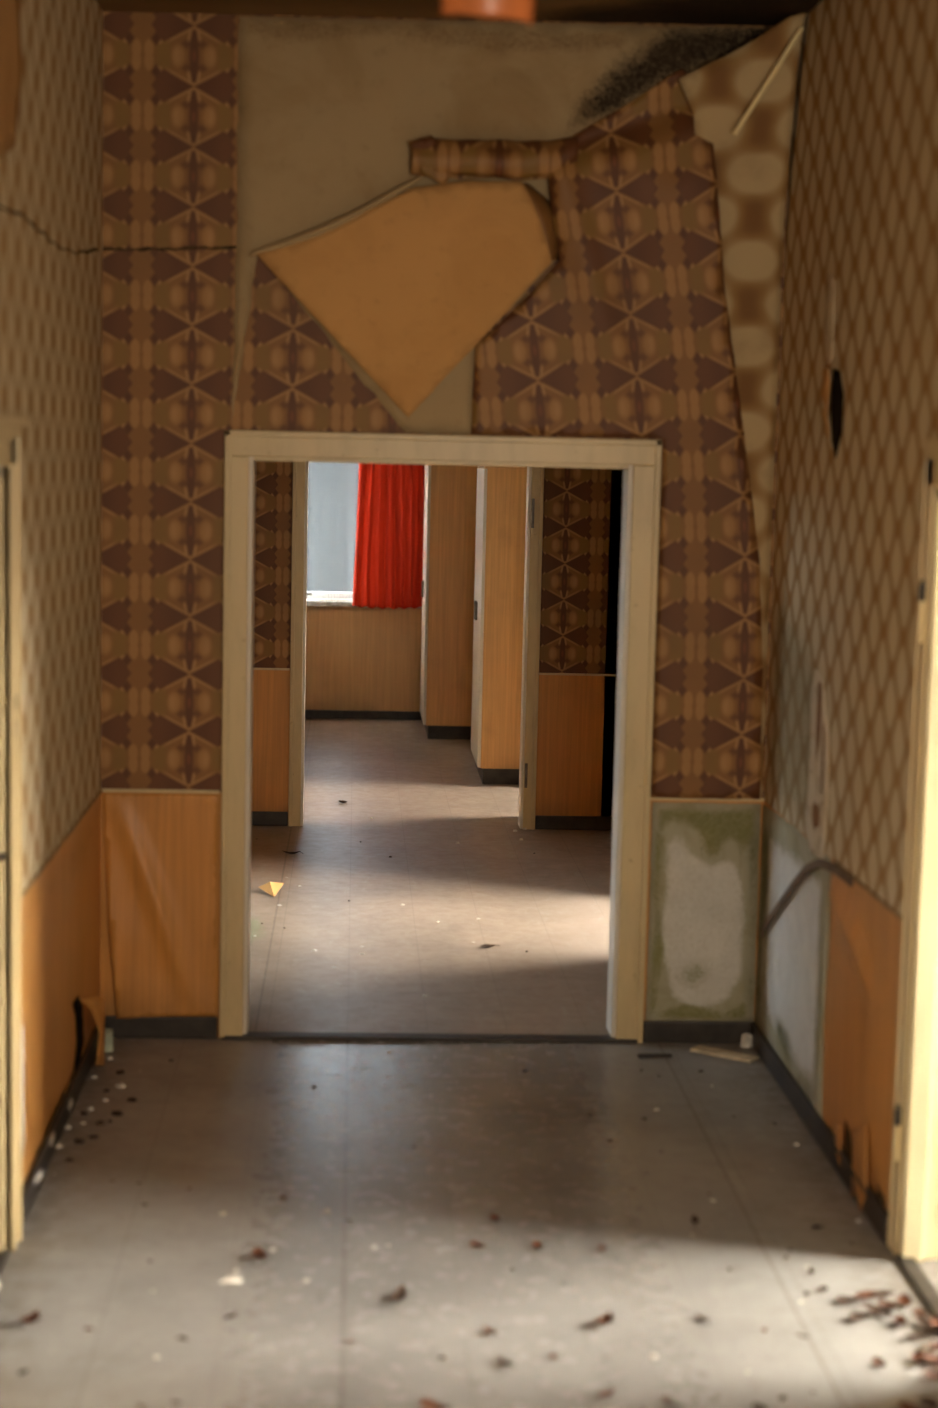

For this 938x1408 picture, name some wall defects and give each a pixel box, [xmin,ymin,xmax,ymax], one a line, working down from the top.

flaking render [0,0,22,157]
flaking render [231,16,771,434]
damp [648,807,792,1061]